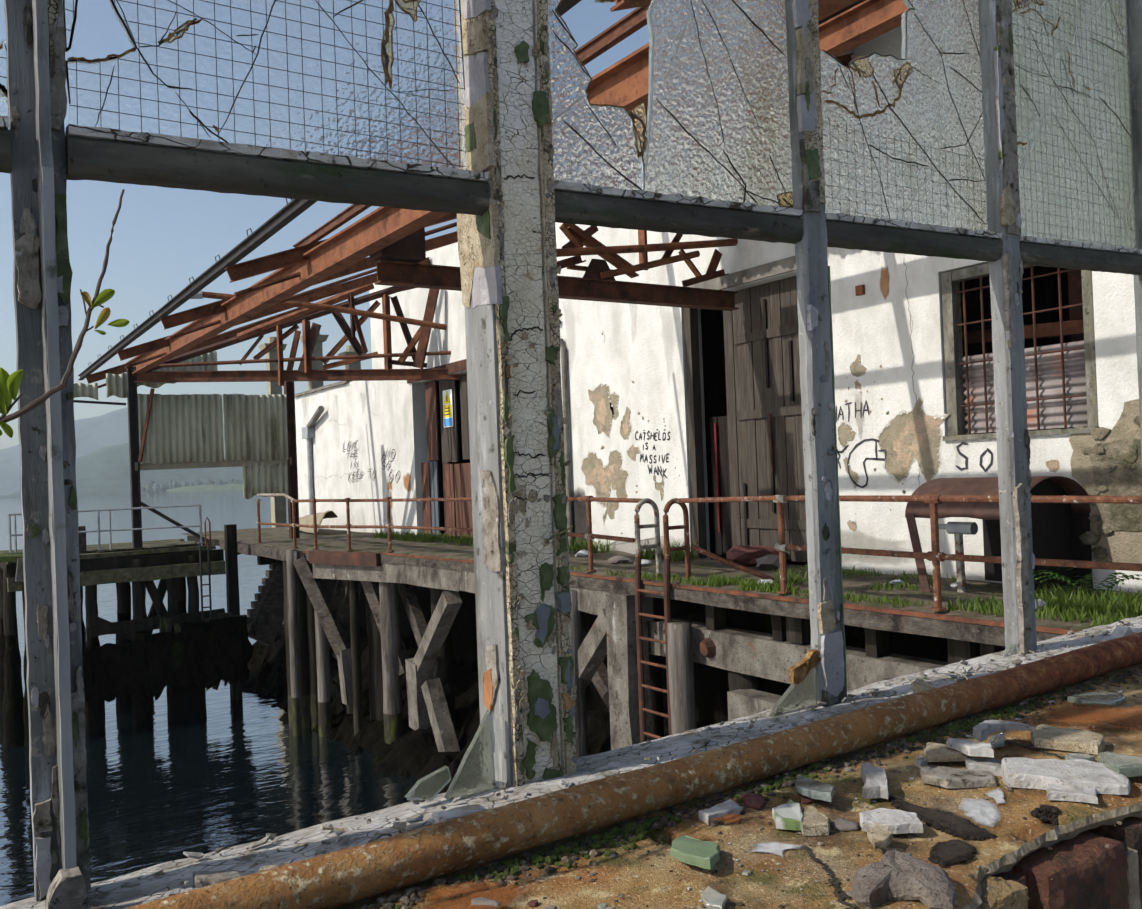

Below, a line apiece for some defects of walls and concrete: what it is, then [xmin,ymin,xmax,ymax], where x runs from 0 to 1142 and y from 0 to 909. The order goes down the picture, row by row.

crack [116,0,276,143]
crack [315,0,460,169]
crack [550,9,642,190]
crack [656,0,787,204]
crack [824,0,986,222]
peeling [14,207,42,309]
peeling [545,383,666,524]
peeling [874,396,950,494]
flaking render [1045,399,1142,564]
peeling [770,421,1142,731]
corrosion [1046,704,1142,728]
corrosion [425,884,518,909]